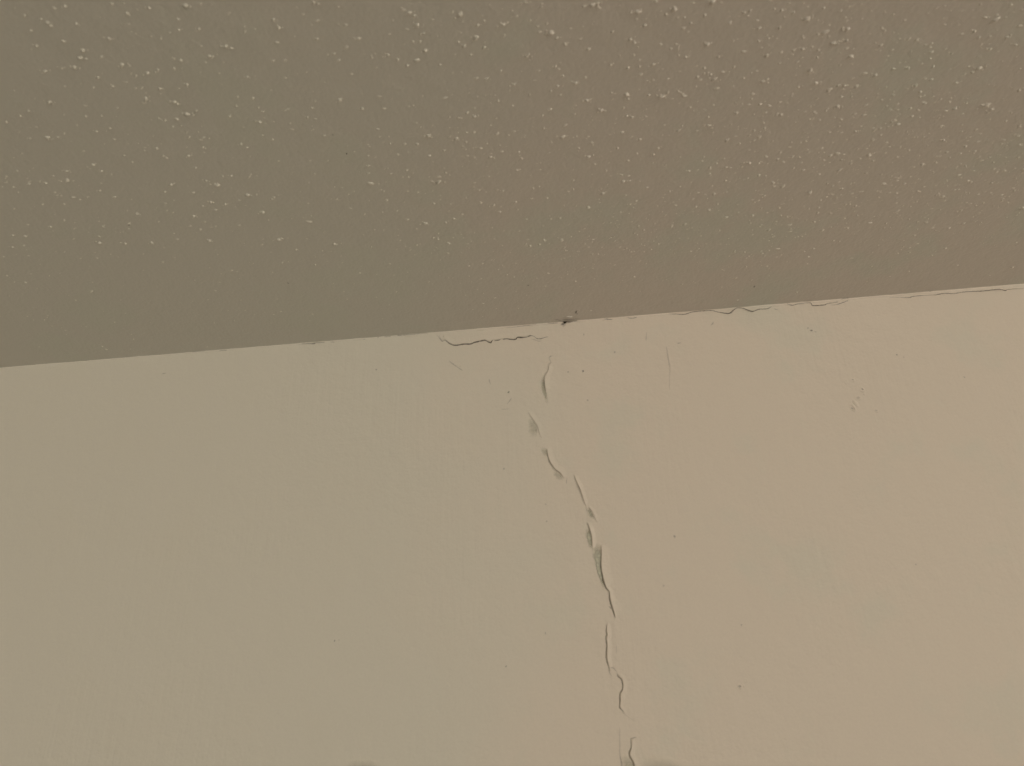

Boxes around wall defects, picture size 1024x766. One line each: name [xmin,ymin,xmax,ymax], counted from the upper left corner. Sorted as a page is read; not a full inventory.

crack [674,300,844,315]
crack [439,332,542,346]
crack [528,363,628,714]